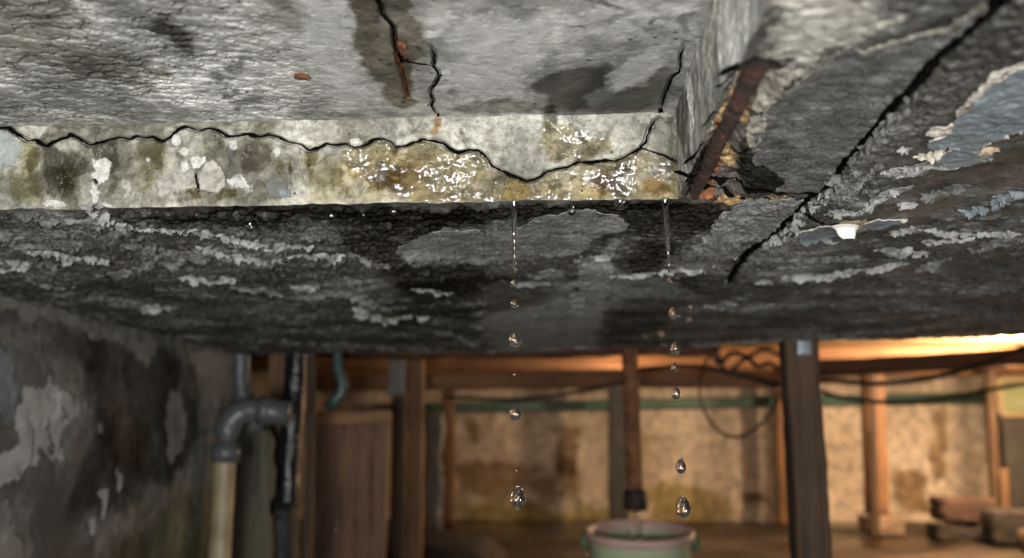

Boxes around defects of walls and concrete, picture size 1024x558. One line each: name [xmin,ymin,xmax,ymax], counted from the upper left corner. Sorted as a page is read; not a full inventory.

crack [0,0,685,182]
damp [441,2,550,102]
damp [607,41,671,92]
rust [712,69,741,131]
efflorescence [41,199,66,208]
efflorescence [90,158,113,208]
damp [303,121,363,148]
damp [501,179,534,200]
rust [699,142,786,206]
crack [684,0,1010,298]
flaking render [672,1,1024,311]
flaking render [0,203,480,558]